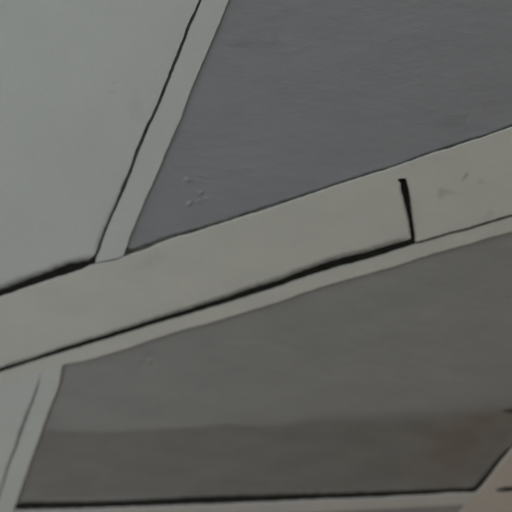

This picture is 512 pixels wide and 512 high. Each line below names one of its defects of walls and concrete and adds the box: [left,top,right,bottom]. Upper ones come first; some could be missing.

crack [0,0,512,296]
crack [0,178,512,372]